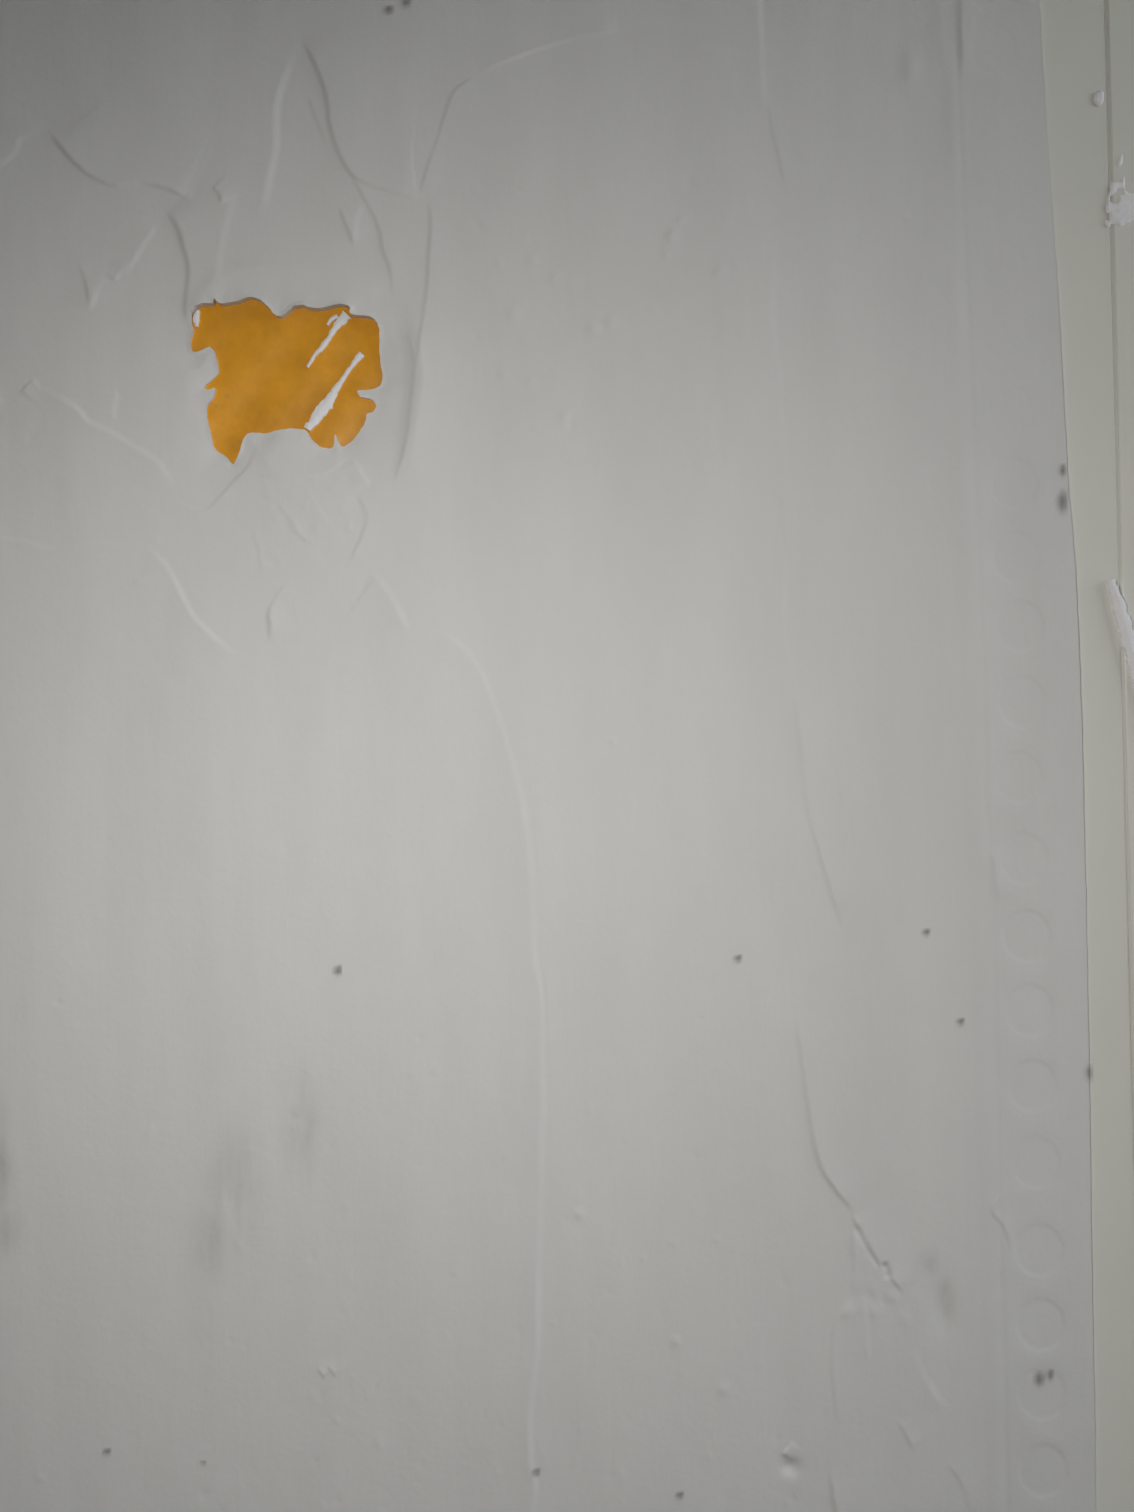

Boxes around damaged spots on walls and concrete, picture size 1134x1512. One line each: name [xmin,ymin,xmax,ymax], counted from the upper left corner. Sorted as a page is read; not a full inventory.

peeling [178,251,430,508]